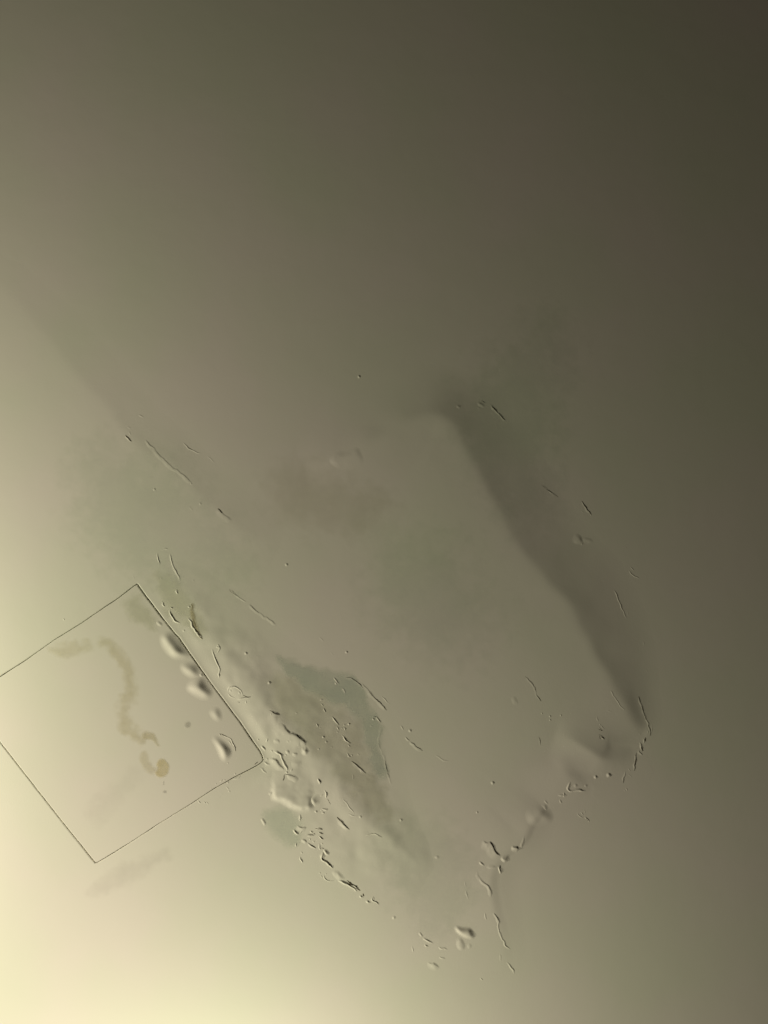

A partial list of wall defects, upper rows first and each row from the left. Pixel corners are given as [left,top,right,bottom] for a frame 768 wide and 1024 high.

crack [127,437,232,524]
peeling [257,710,310,774]
crack [622,697,653,792]
peeling [293,814,330,856]
crack [464,835,525,900]